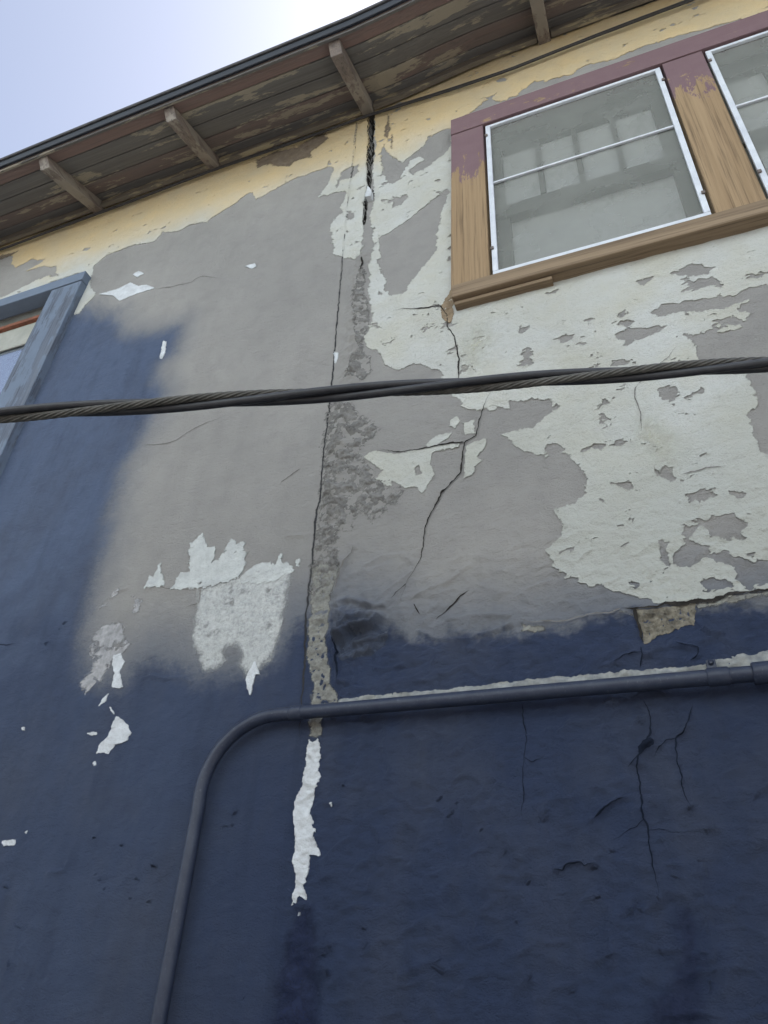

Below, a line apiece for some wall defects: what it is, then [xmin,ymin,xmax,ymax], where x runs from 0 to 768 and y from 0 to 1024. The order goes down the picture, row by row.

peeling [0,0,768,380]
crack [281,115,375,726]
crack [396,304,460,378]
crack [371,395,489,597]
peeling [133,374,768,705]
peeling [80,623,132,766]
spalling [291,717,328,916]
crack [556,861,591,871]
crack [594,702,698,895]